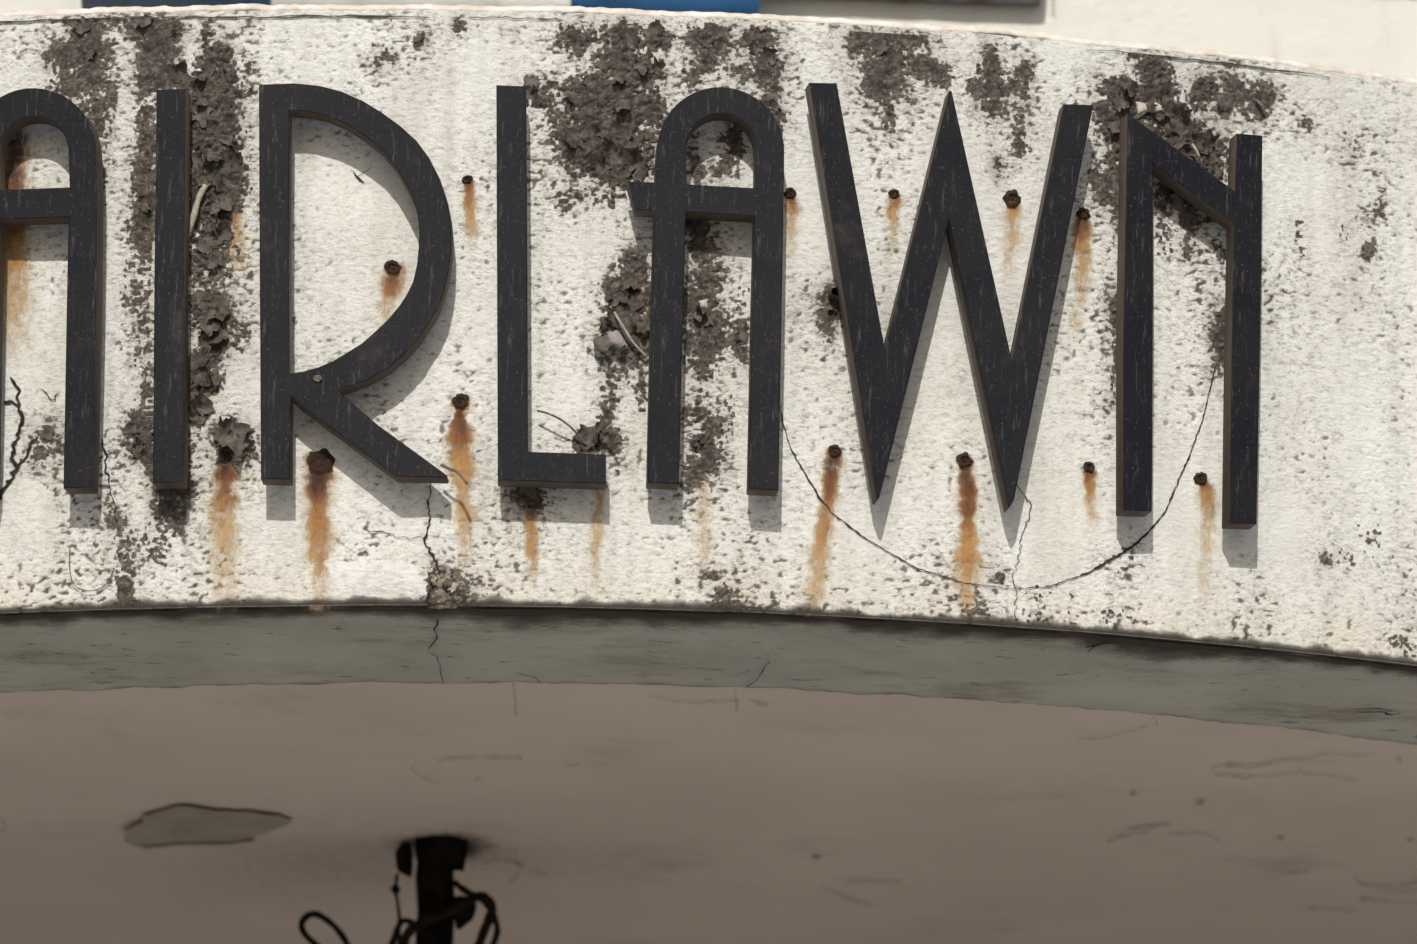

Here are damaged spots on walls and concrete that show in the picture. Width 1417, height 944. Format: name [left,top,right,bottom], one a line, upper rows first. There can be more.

rust [5,129,26,190]
water stain [0,14,1417,676]
crack [0,377,59,500]
rust [213,453,239,552]
rust [305,448,335,575]
crack [363,483,443,681]
rust [447,393,474,540]
rust [811,444,842,603]
rust [955,452,981,604]
crack [780,367,1216,617]
rust [1193,472,1214,528]
peeling [124,806,292,849]